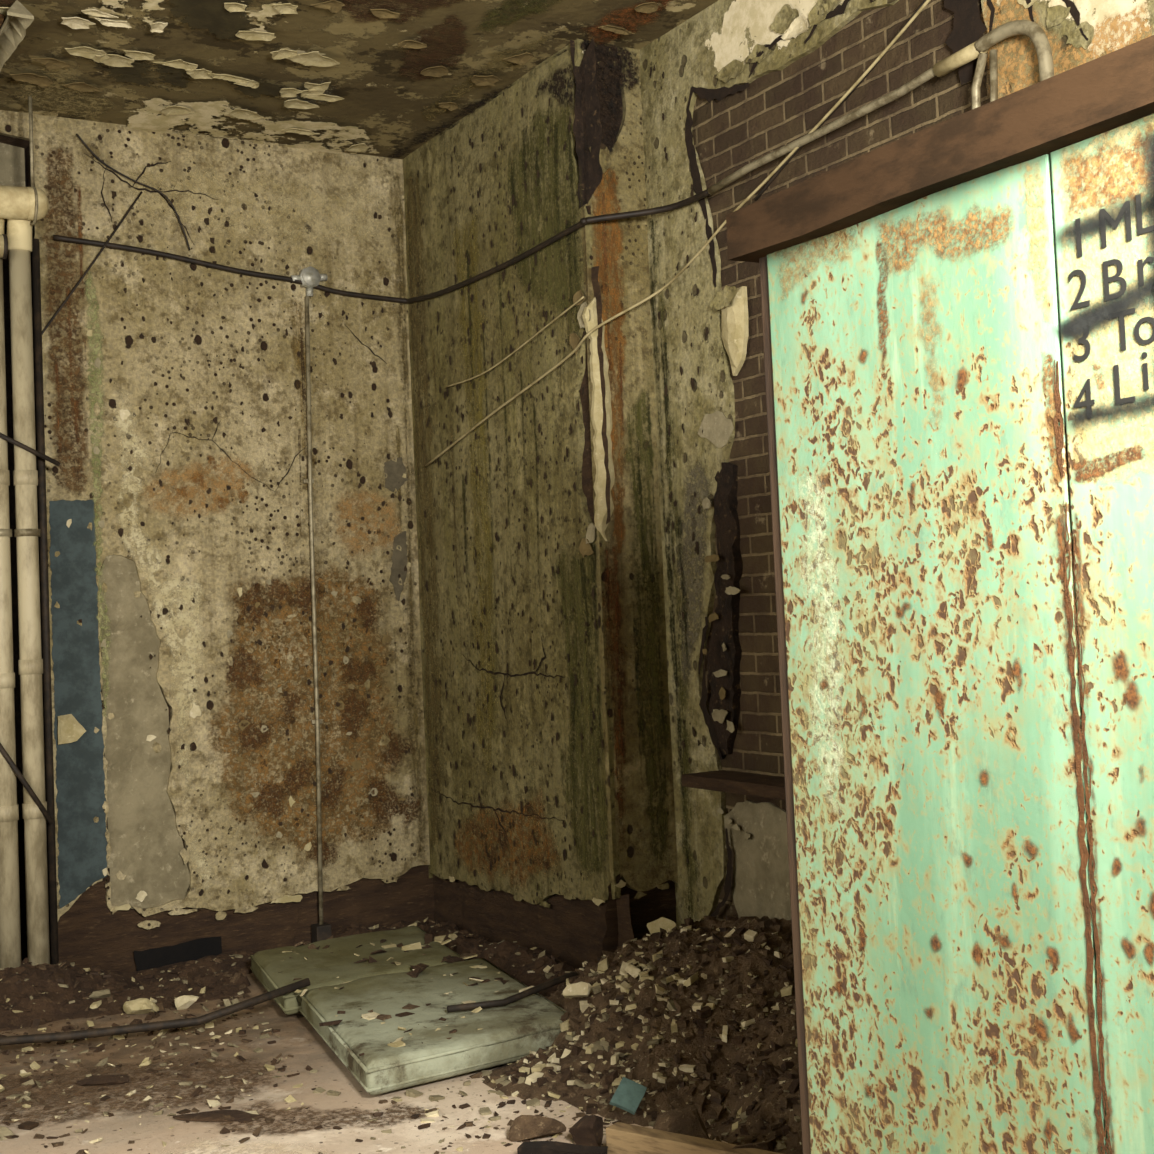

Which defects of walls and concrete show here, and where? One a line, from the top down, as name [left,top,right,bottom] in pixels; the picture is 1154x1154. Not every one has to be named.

peeling [0,0,379,154]
peeling [370,8,400,18]
damp [389,84,513,159]
damp [291,305,314,491]
spalling [49,35,677,973]
damp [337,176,444,858]
damp [453,228,496,759]
rust [594,169,626,843]
flaking render [664,366,734,448]
spalling [665,459,743,760]
peeling [691,285,749,376]